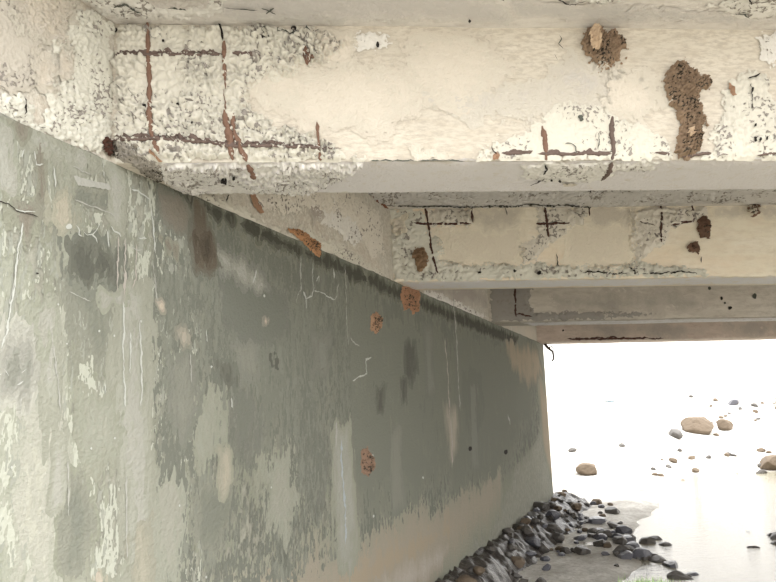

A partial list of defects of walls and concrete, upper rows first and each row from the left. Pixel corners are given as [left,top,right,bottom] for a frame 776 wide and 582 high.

crack [0,201,38,348]
spalling [0,0,776,331]
leakage [0,117,776,582]